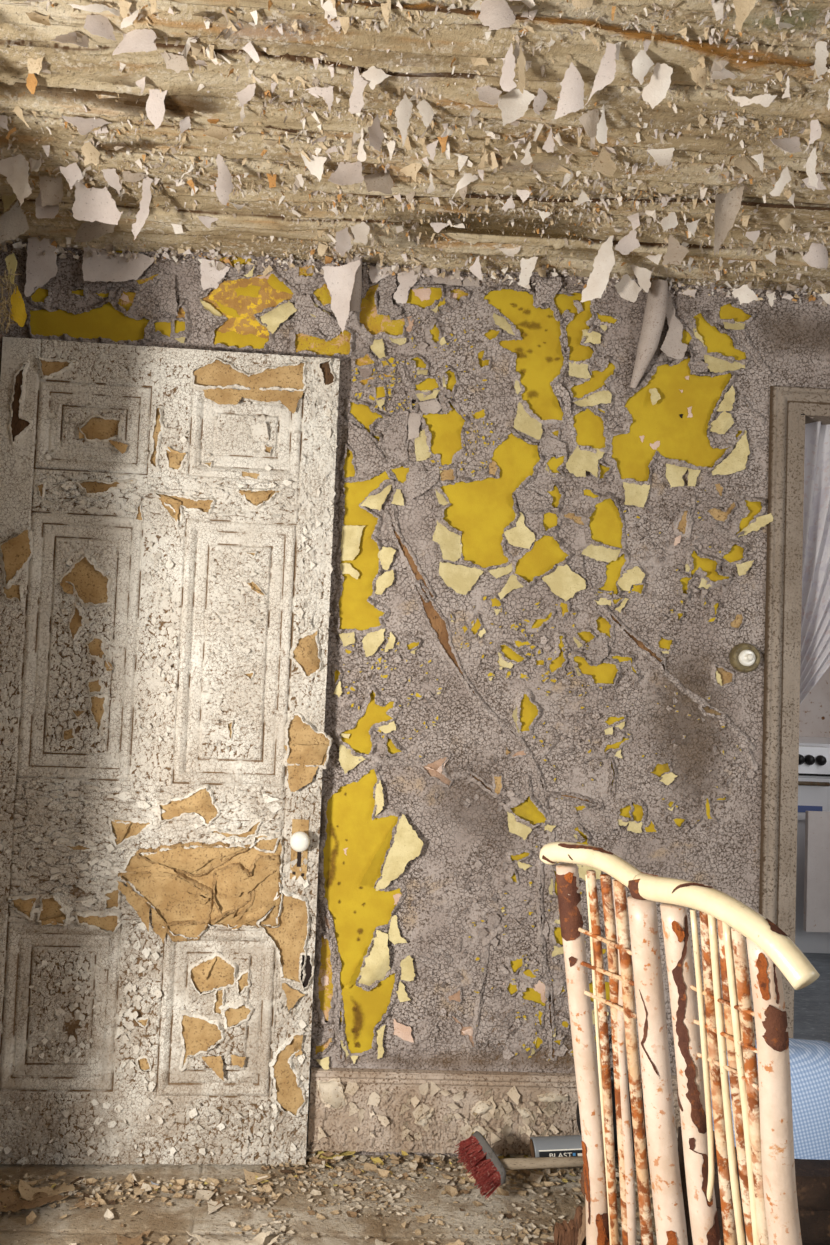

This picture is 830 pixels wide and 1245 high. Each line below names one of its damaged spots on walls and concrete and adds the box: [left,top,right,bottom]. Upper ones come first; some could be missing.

peeling [348,66,391,114]
peeling [473,42,547,126]
peeling [578,42,624,176]
peeling [642,63,673,109]
peeling [0,116,775,1169]
crack [576,556,758,771]
crack [347,363,618,1061]
rust [672,921,685,943]
rust [756,953,770,1001]
rust [581,1141,590,1202]
rust [595,1213,610,1245]
rust [666,1230,678,1245]